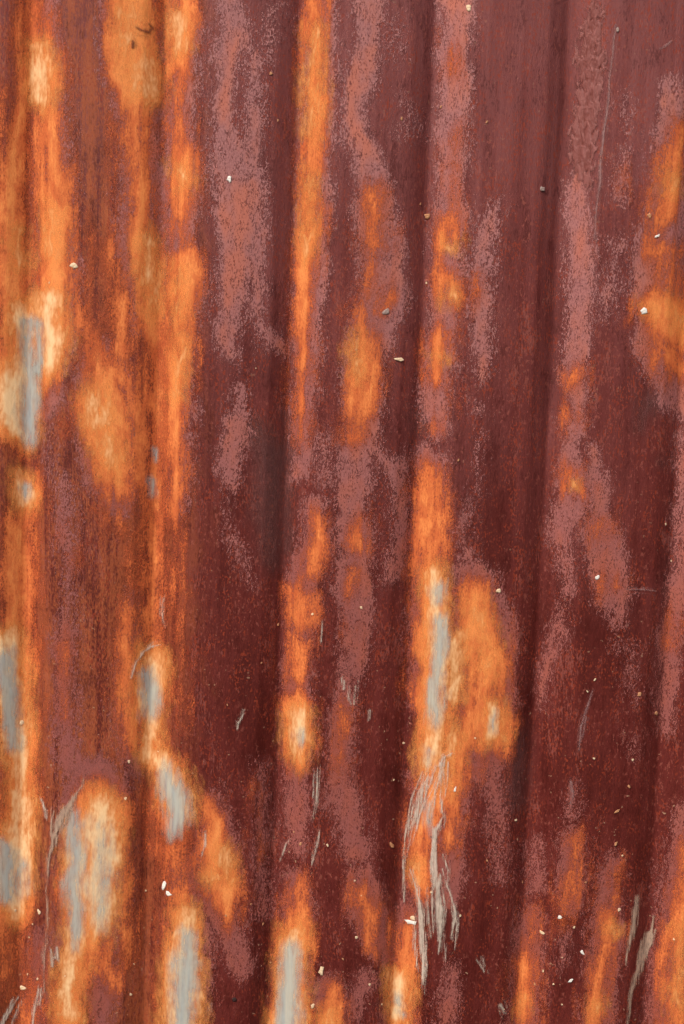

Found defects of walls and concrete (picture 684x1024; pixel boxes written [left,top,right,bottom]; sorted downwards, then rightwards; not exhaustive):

corrosion [0,0,525,1024]
corrosion [527,71,684,765]